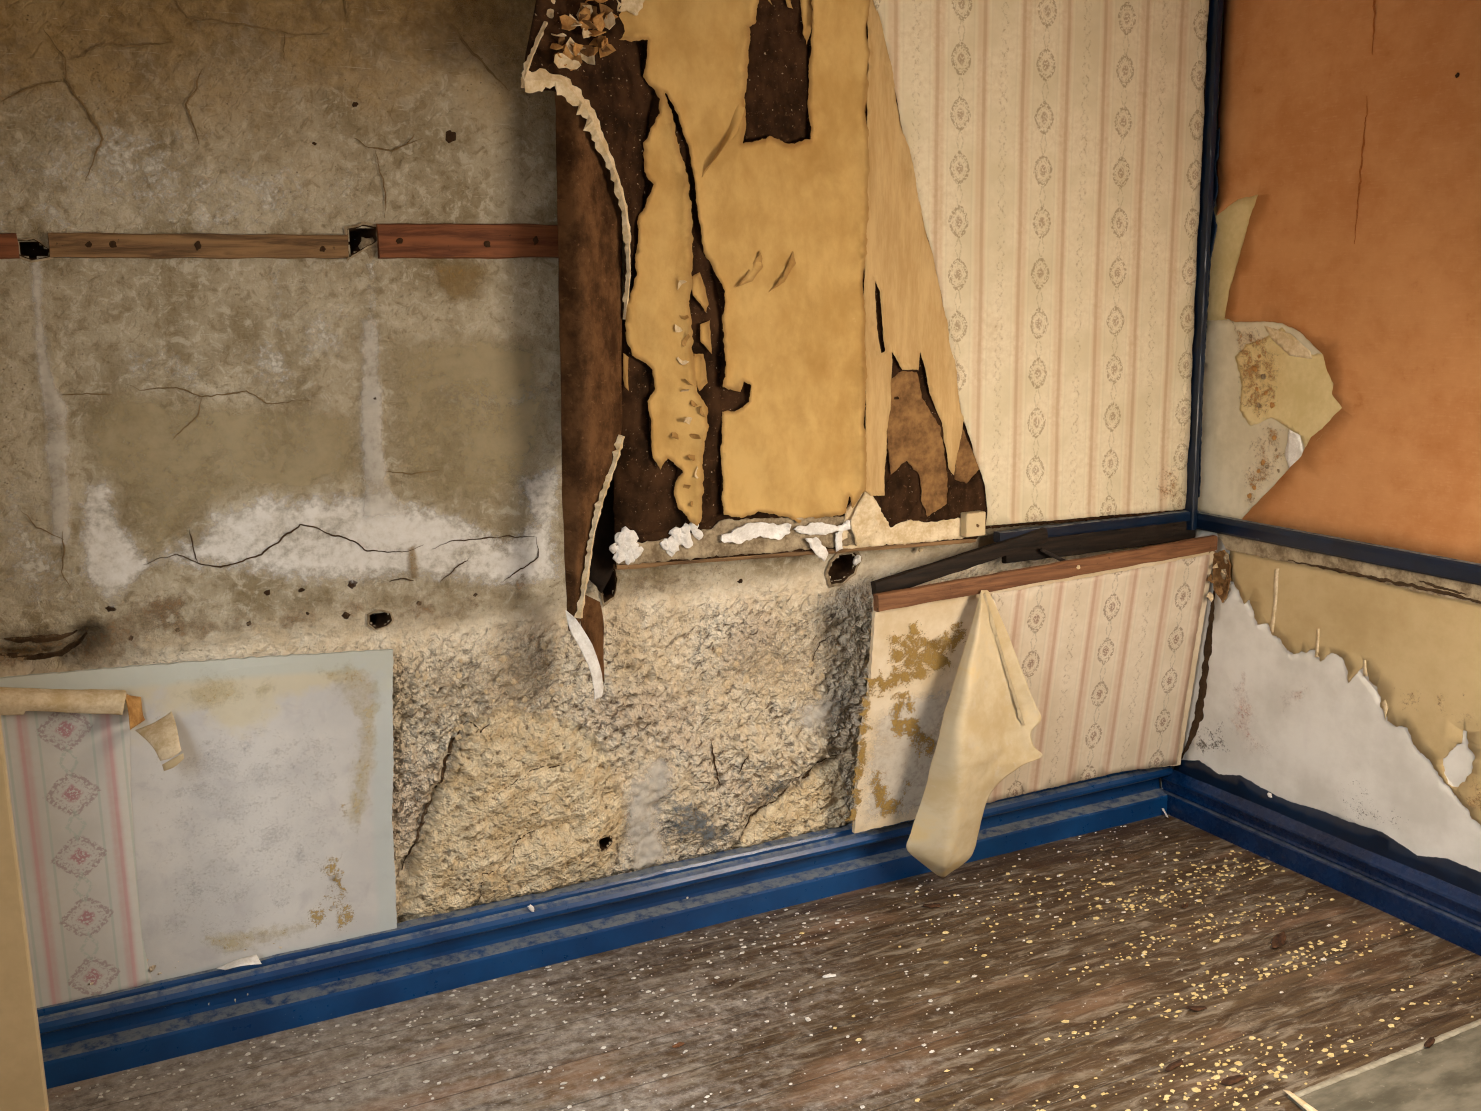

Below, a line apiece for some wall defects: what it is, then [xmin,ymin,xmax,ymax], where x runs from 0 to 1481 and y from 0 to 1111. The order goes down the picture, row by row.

crack [2,0,321,181]
peeling [600,0,987,607]
water stain [84,342,558,607]
crack [148,524,539,583]
peeling [1198,320,1342,519]
peeling [0,687,184,771]
crack [402,720,496,870]
flaking render [400,651,626,922]
flaking render [729,756,849,850]
water stain [845,620,966,826]
peeling [1184,550,1481,872]